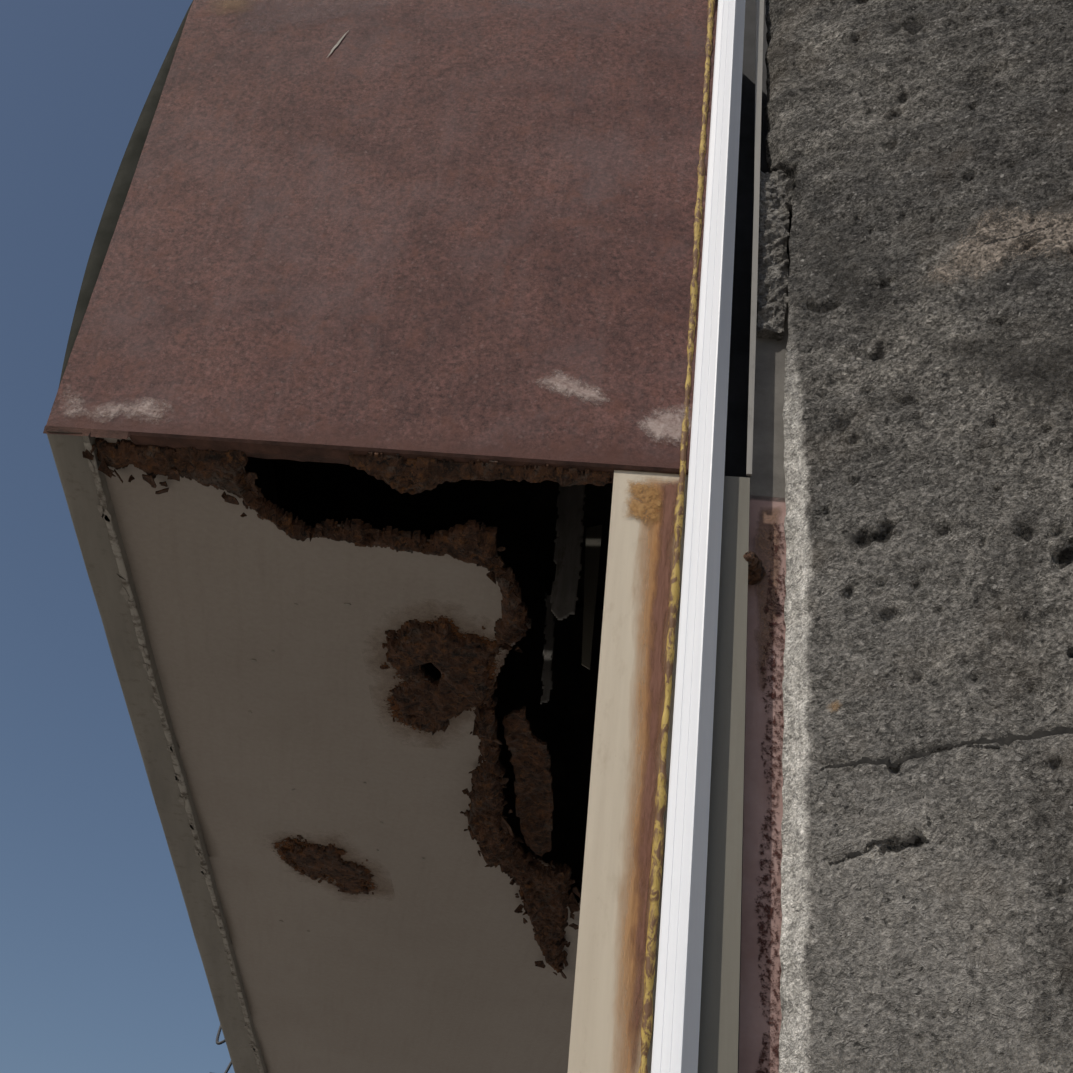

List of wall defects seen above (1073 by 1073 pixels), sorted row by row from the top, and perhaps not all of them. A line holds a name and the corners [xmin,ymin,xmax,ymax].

rust [82,438,612,979]
rust [619,482,679,1073]
rust [756,509,786,1073]
crack [828,835,929,865]
crack [820,726,1073,770]